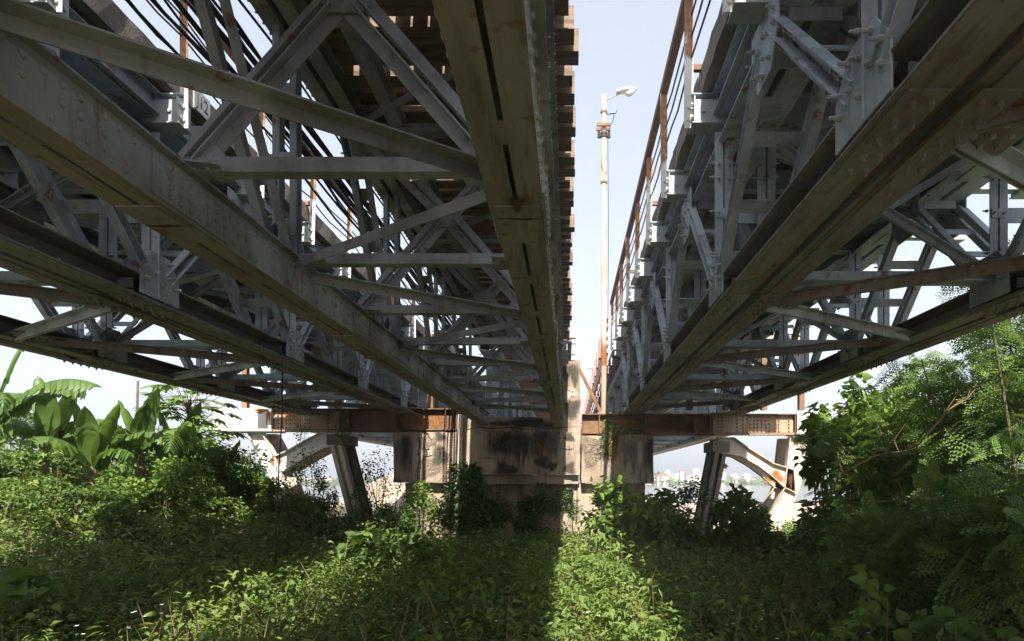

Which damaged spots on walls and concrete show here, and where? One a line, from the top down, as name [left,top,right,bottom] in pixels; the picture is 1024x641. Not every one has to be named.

corrosion [421,416,443,427]
damp [490,417,574,474]
damp [623,439,653,473]